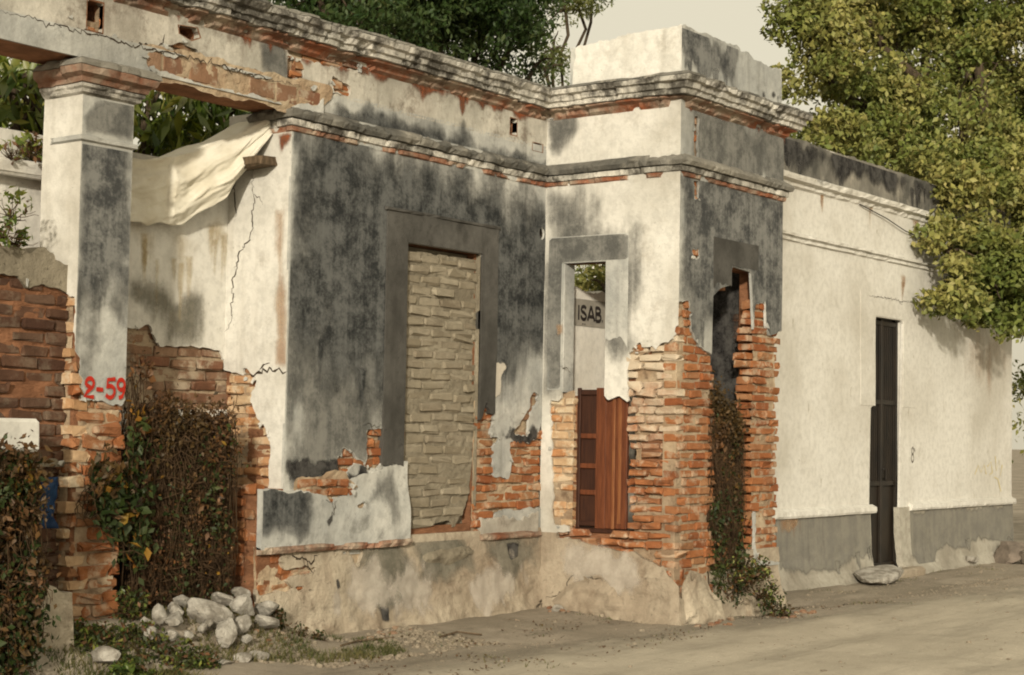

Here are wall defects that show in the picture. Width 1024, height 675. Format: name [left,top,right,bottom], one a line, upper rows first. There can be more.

crack [2,10,303,87]
flaking render [141,24,362,113]
water stain [682,28,738,82]
water stain [695,110,929,208]
flaking render [0,274,271,621]
water stain [76,144,202,365]
crack [225,170,263,331]
crack [250,363,287,377]
flaking render [293,429,382,508]
water stain [262,132,638,537]
flaking render [470,301,716,598]
water stain [682,177,783,414]